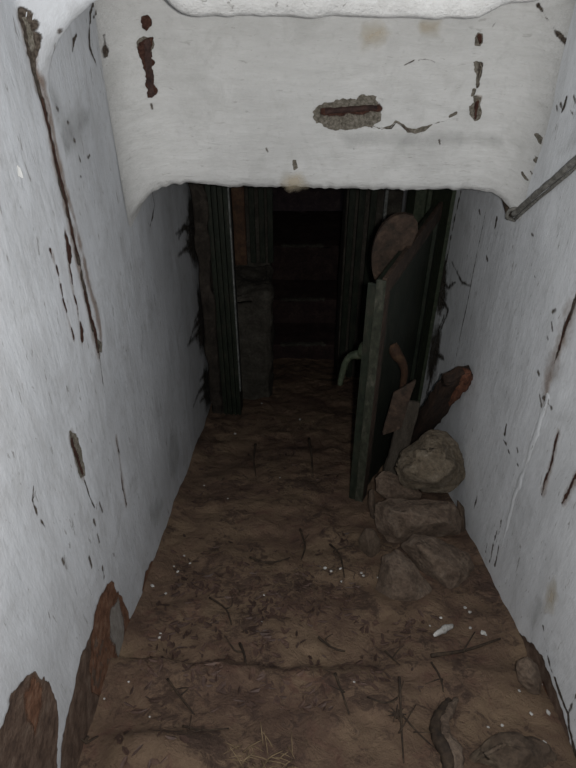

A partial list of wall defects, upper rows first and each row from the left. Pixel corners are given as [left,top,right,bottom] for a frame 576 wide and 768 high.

spalling [136,15,158,109]
spalling [313,94,383,131]
crack [371,111,457,134]
spalling [469,61,483,121]
crack [537,295,576,409]
spalling [69,431,85,478]
peeling [0,581,130,768]